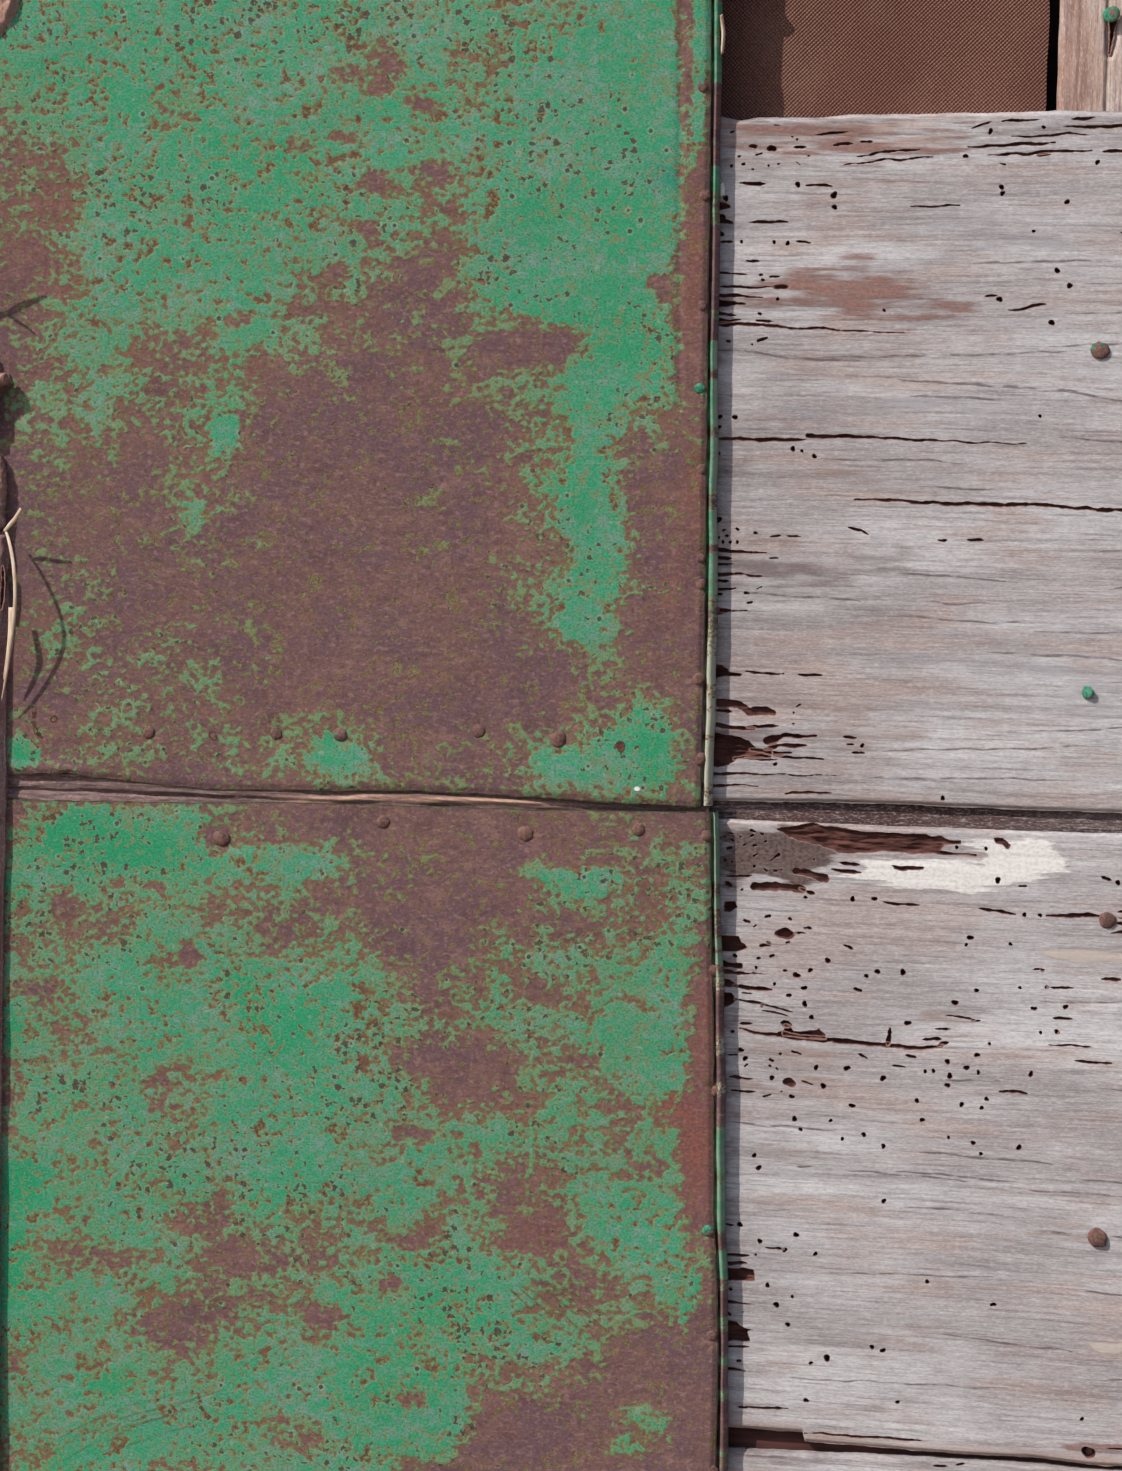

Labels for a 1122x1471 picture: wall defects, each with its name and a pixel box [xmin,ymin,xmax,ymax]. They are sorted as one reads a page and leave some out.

crack [1107,20,1118,56]
crack [844,149,933,165]
crack [967,124,1122,156]
crack [719,312,1122,401]
crack [718,433,1122,513]
crack [903,573,1122,661]
corrosion [0,0,717,1471]
peeling [993,837,1011,849]
crack [739,1020,997,1081]